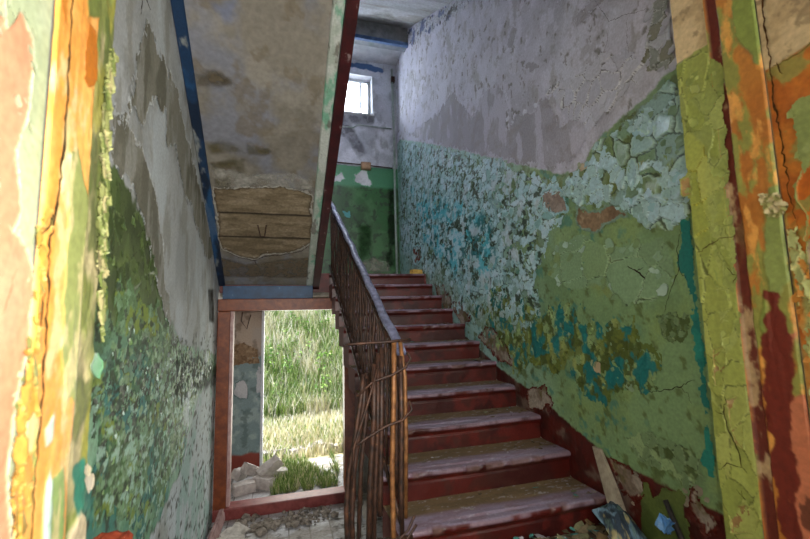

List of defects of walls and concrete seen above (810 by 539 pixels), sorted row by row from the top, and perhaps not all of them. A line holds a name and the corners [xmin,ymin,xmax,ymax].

peeling [0,0,55,539]
crack [31,0,74,539]
peeling [84,23,216,539]
water stain [200,72,231,85]
flaking render [212,185,314,260]
peeling [400,0,741,414]
peeling [758,95,810,365]
crack [761,0,810,219]